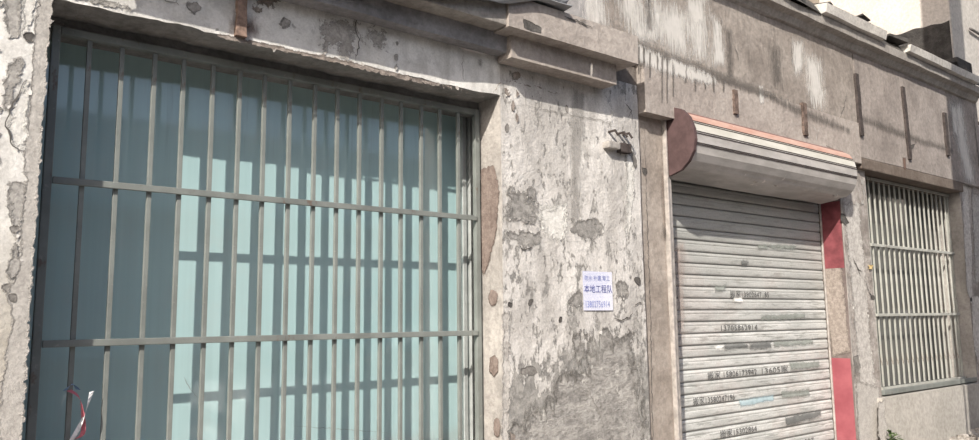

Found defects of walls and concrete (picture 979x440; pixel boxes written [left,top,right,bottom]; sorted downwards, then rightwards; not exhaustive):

flaking render [184,1,202,15]
flaking render [217,18,468,93]
damp [585,0,775,103]
damp [772,51,780,83]
damp [791,40,825,110]
crack [5,82,24,153]
peeling [0,0,53,440]
flaking render [480,165,604,274]
flaking render [568,290,582,307]
flaking render [615,280,629,301]
flaking render [500,313,649,440]